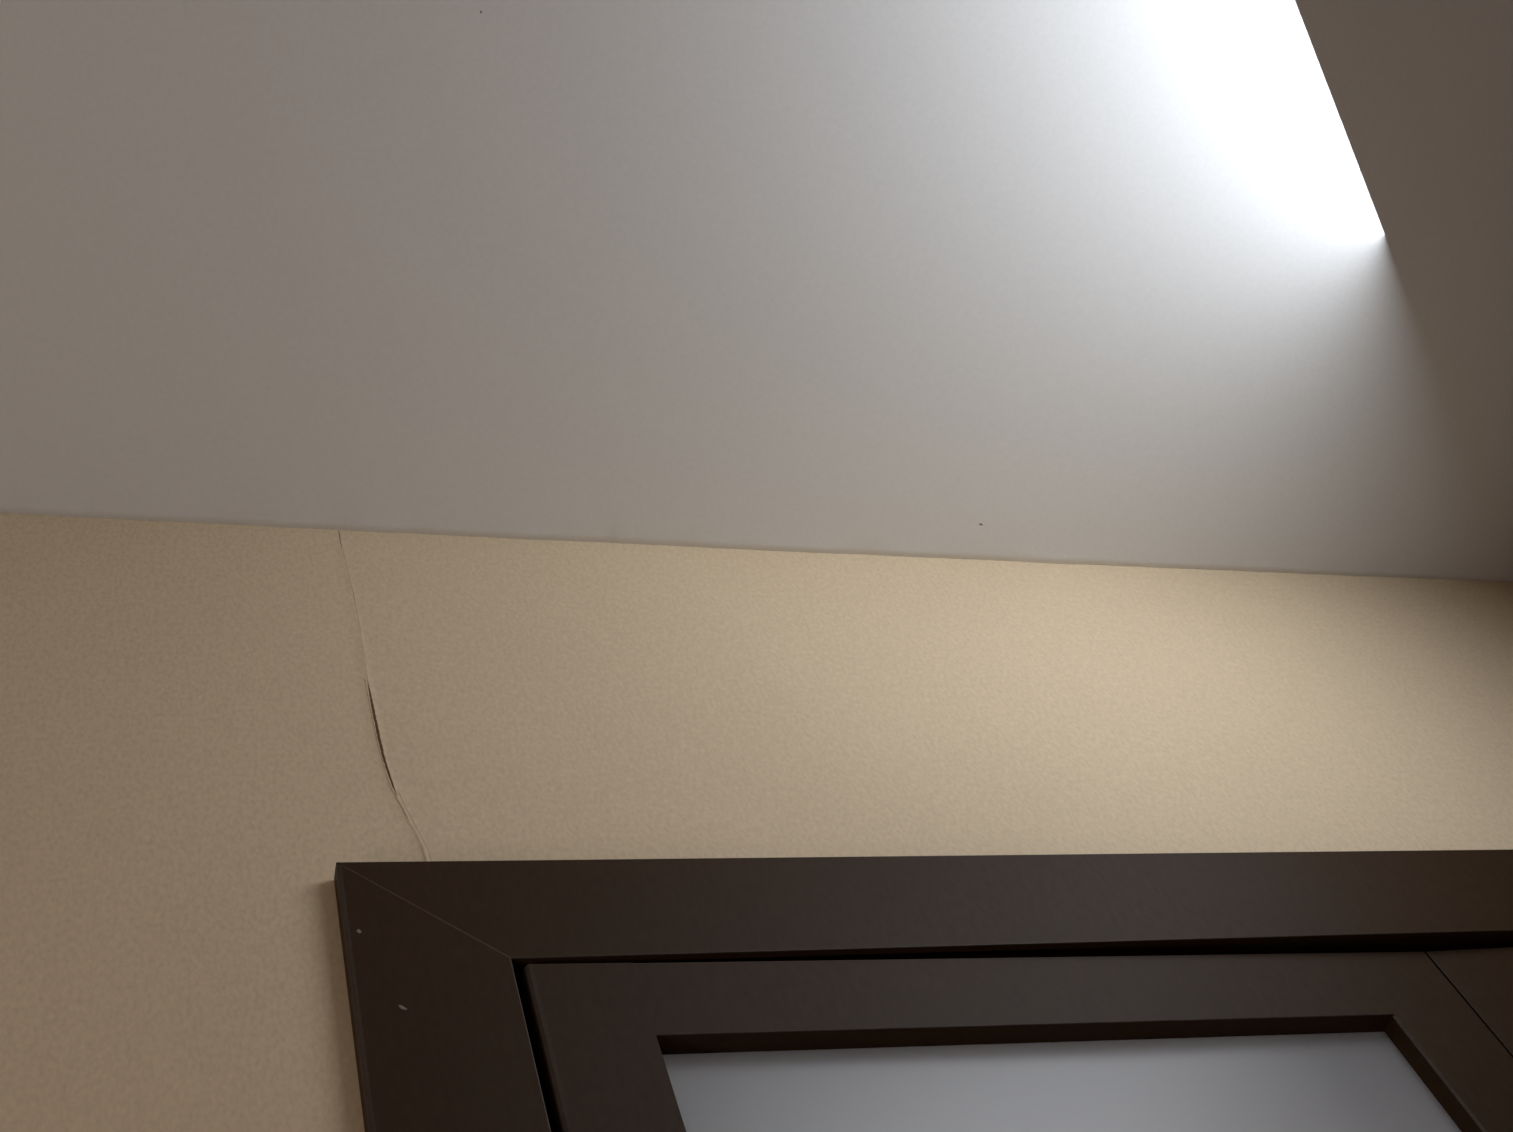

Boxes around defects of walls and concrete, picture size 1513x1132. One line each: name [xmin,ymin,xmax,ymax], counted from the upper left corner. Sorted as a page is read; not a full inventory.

crack [338,531,431,861]